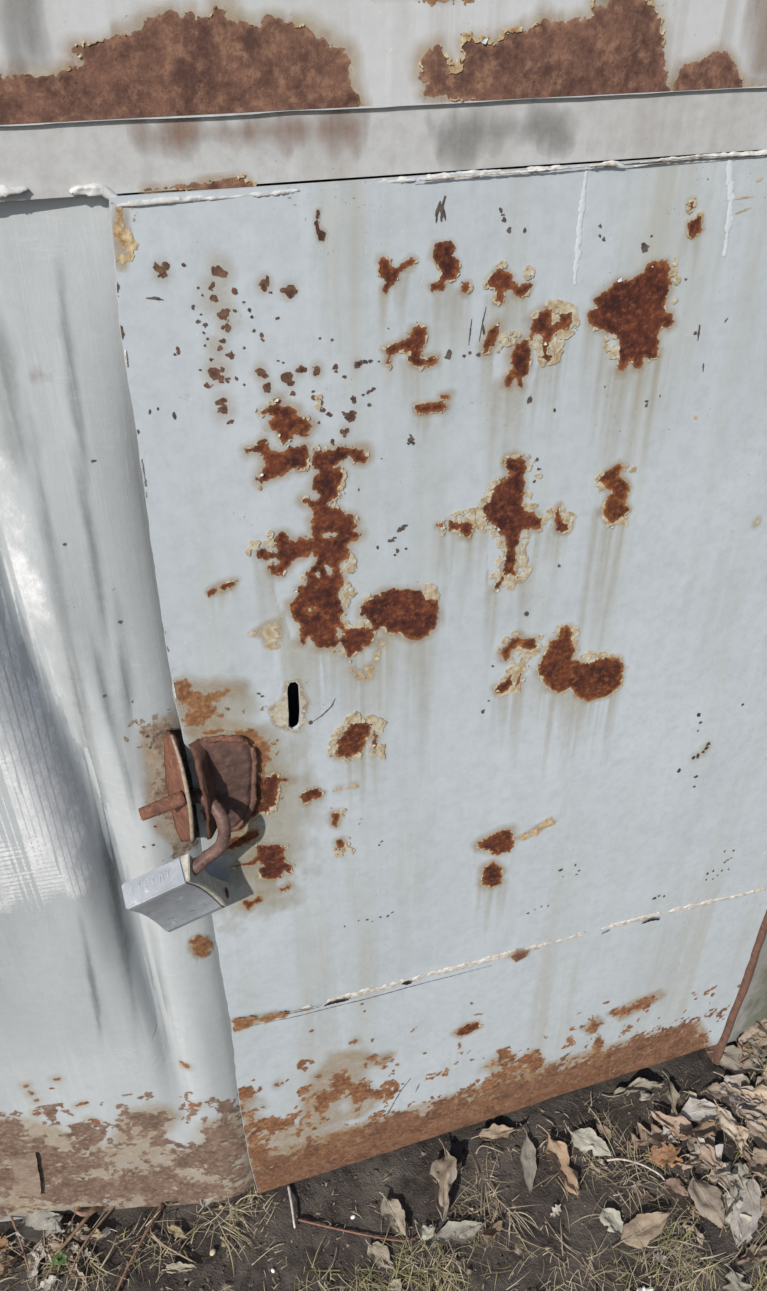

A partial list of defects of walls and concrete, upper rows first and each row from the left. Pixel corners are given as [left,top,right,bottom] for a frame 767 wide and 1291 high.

corrosion [0,4,363,146]
corrosion [418,0,744,102]
corrosion [383,321,438,371]
corrosion [377,240,535,306]
corrosion [482,257,681,388]
corrosion [245,394,440,663]
corrosion [436,454,577,592]
corrosion [594,463,637,529]
corrosion [494,624,629,702]
corrosion [124,678,295,910]
corrosion [476,828,514,888]
corrosion [0,985,730,1220]